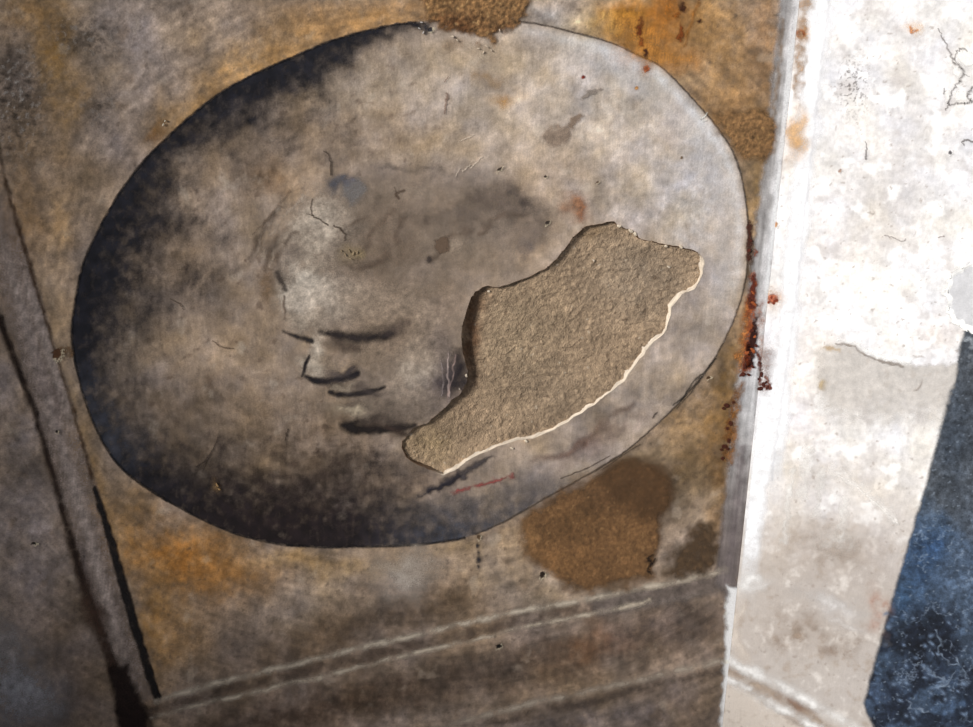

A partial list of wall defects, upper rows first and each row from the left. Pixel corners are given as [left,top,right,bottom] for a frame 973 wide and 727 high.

crack [940,32,973,110]
spalling [402,221,705,476]
rust [720,220,778,464]